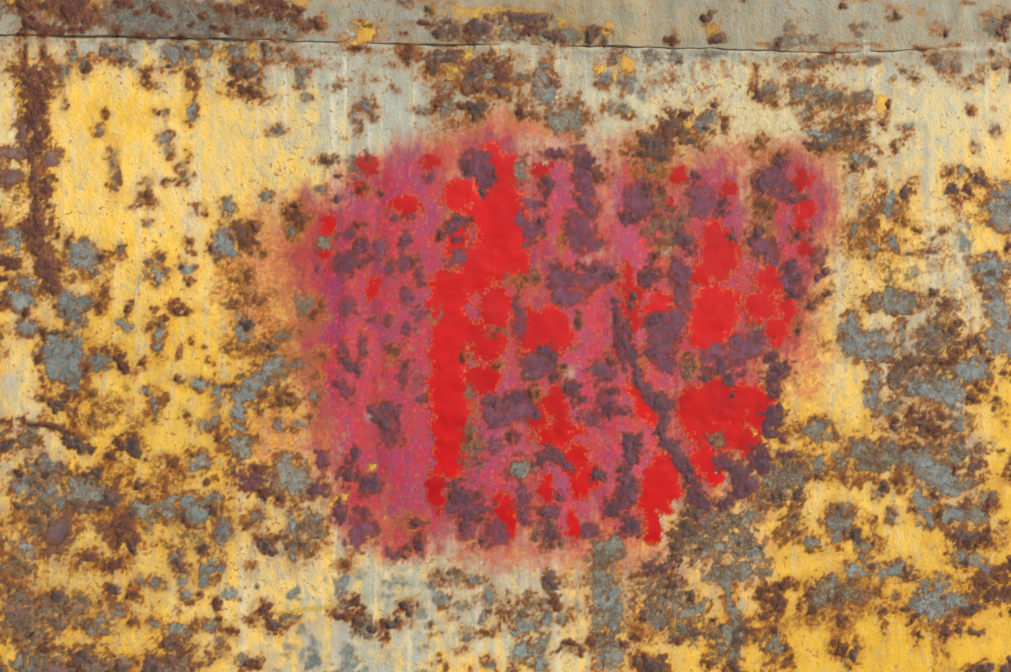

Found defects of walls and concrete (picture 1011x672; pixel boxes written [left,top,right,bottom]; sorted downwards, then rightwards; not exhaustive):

corrosion [0,0,328,299]
spalling [343,95,380,140]
corrosion [385,3,614,144]
spalling [0,206,148,403]
spalling [143,196,269,288]
spalling [419,131,1011,672]
corrosion [0,385,213,672]
spalling [126,313,326,668]
corrosion [218,433,334,571]
spalling [282,447,429,598]
corrosion [221,592,420,648]
corrosion [700,563,807,672]